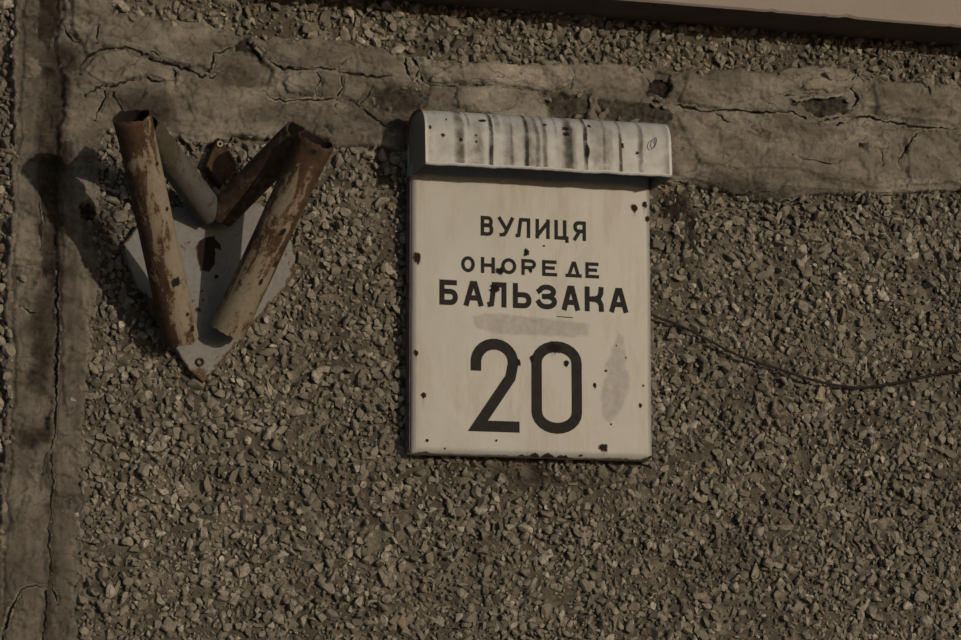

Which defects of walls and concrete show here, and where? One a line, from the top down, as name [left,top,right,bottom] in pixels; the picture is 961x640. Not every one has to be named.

crack [62,25,575,133]
crack [669,69,961,198]
spalling [788,91,853,127]
crack [668,178,818,207]
corrosion [196,236,221,278]
crack [0,270,62,640]